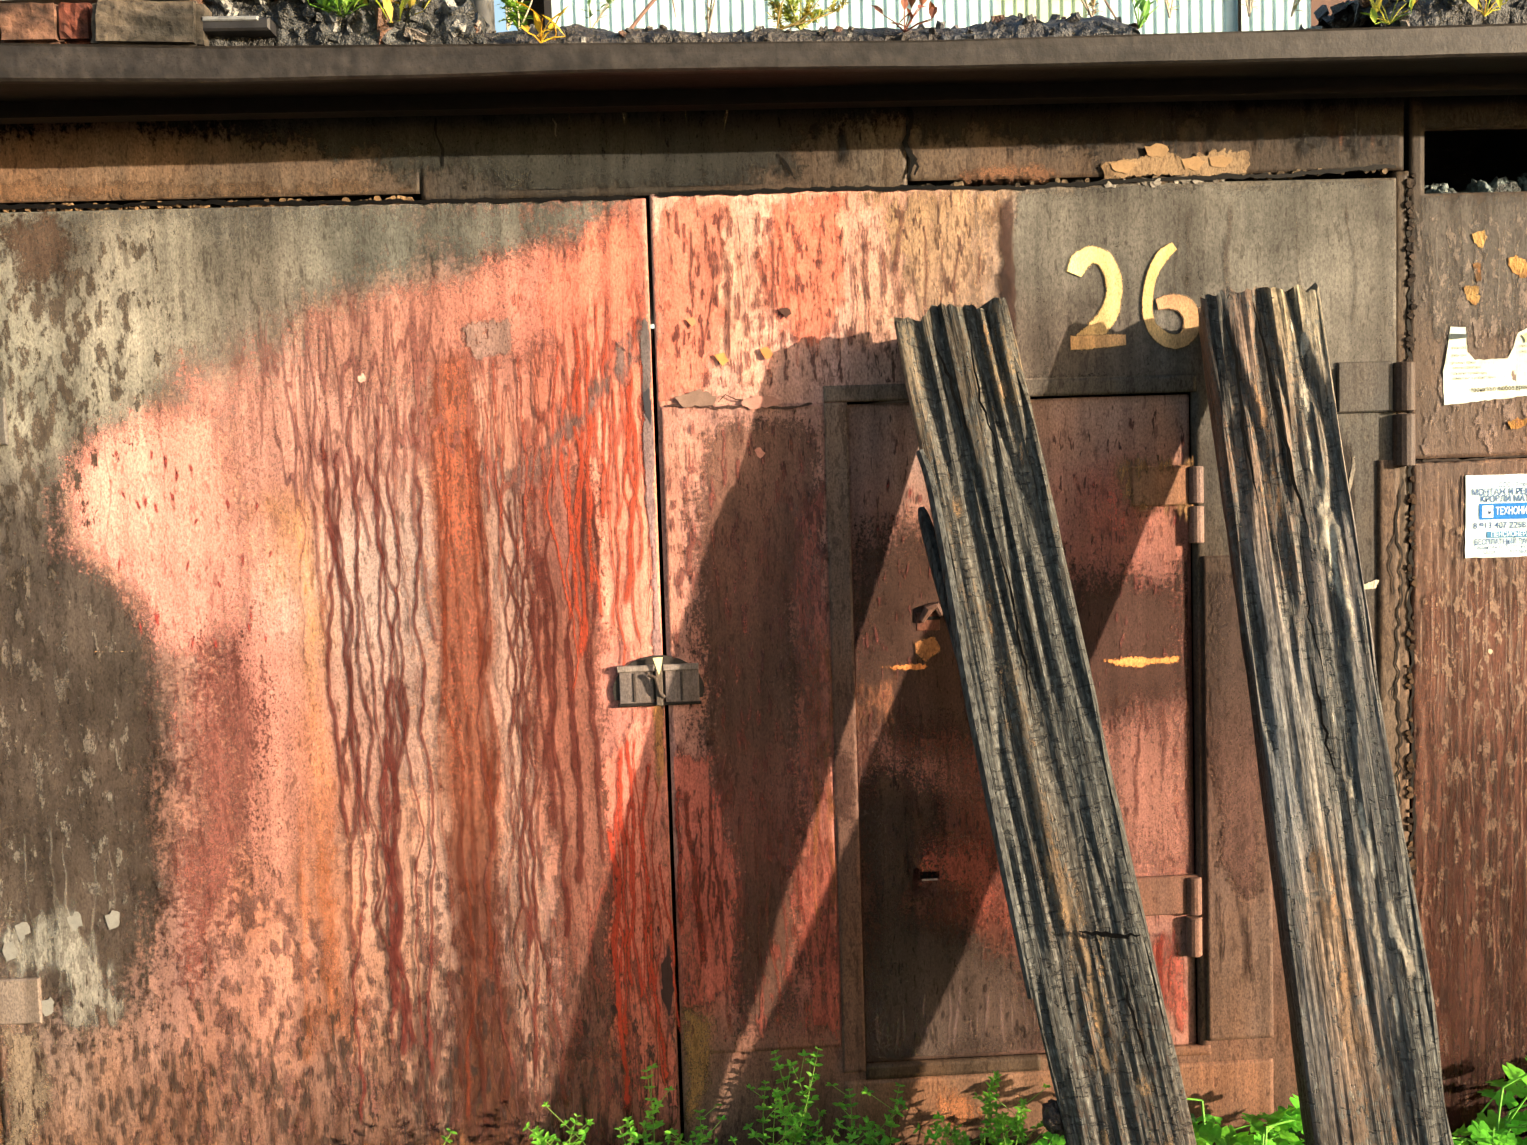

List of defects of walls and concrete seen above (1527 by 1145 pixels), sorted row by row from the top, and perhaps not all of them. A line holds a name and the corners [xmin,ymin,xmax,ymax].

corrosion [266,497,335,938]
leakage [0,190,1038,1145]
corrosion [428,196,840,1145]
corrosion [852,504,1044,1059]
leakage [1050,411,1184,774]
corrosion [1116,455,1195,517]
leakage [1127,770,1186,875]
corrosion [1063,543,1268,980]
corrosion [1152,932,1188,1033]
corrosion [1414,565,1527,1144]